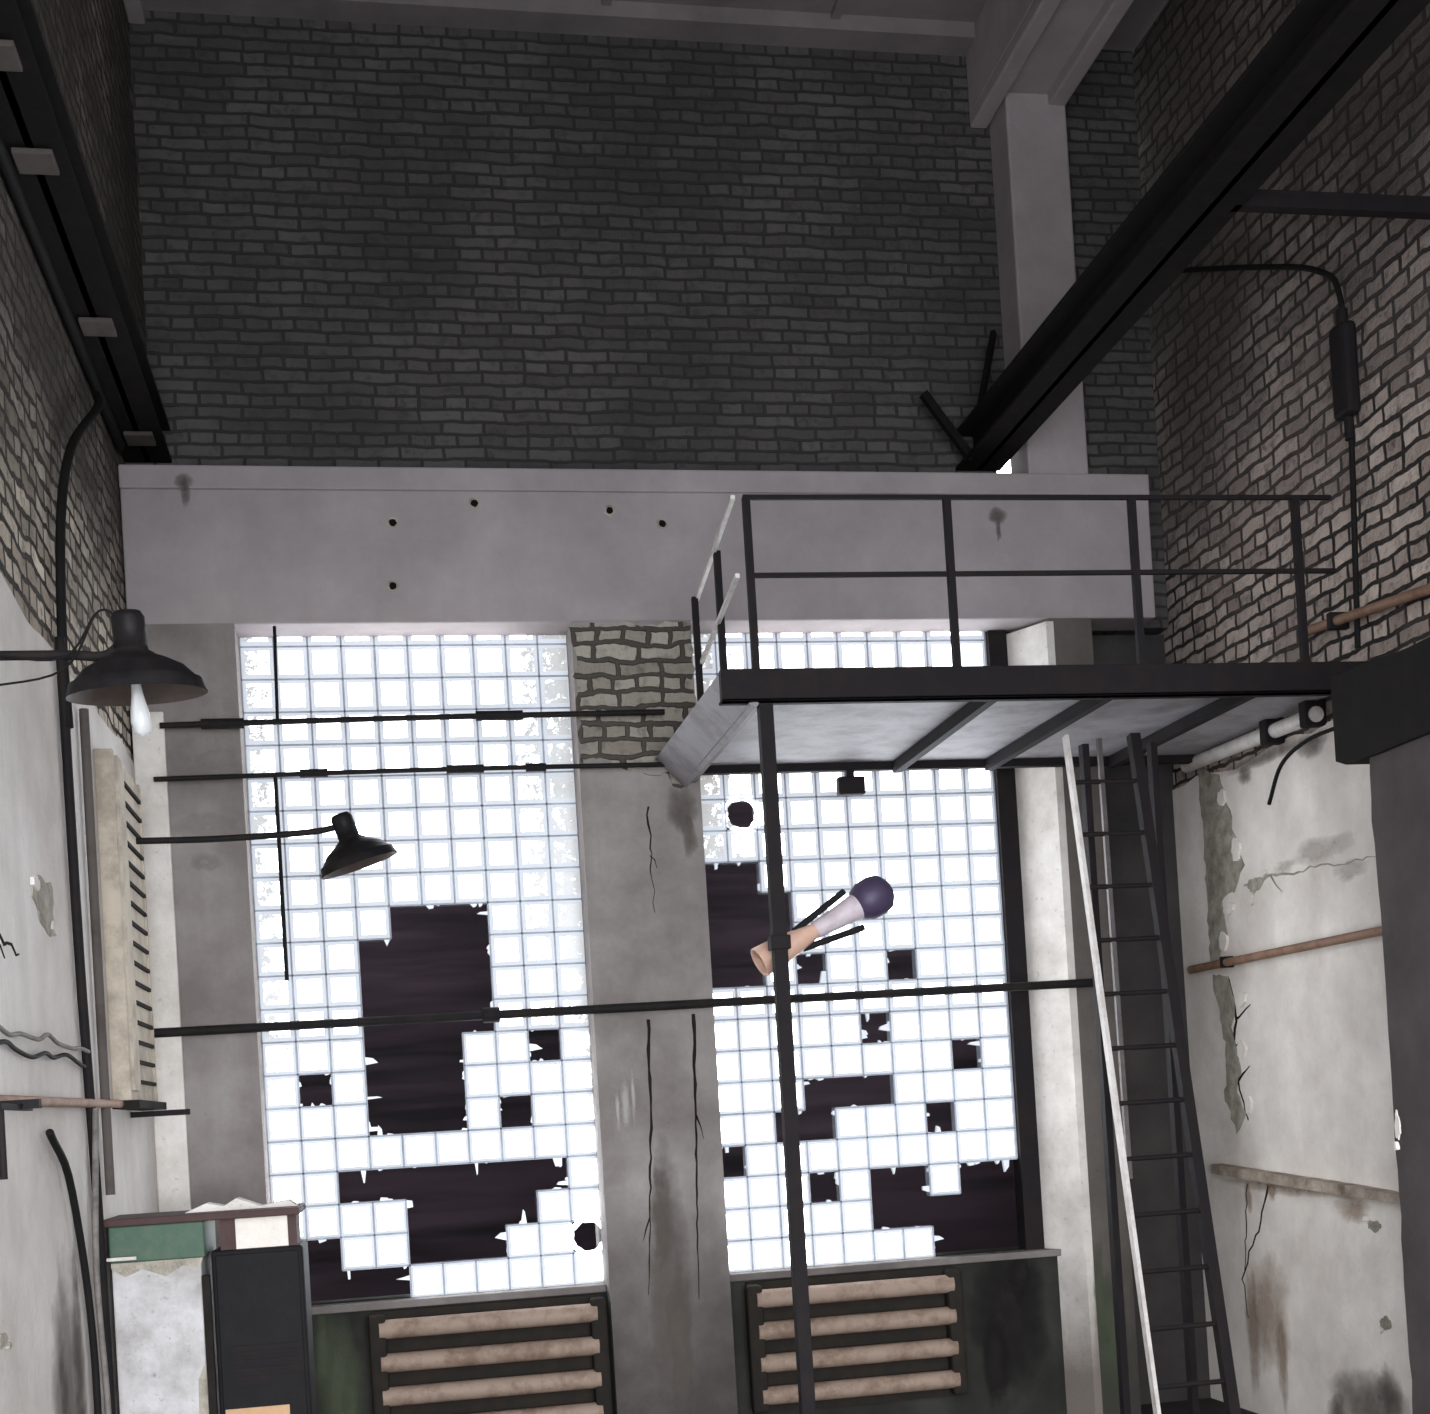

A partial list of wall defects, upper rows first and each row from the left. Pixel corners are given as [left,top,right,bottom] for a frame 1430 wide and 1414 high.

crack [1244,856,1376,891]
crack [0,933,20,959]
peeling [1198,767,1268,1134]
crack [643,1019,653,1295]
crack [692,1014,704,1293]
water stain [1249,1284,1285,1381]
water stain [1332,1378,1397,1414]